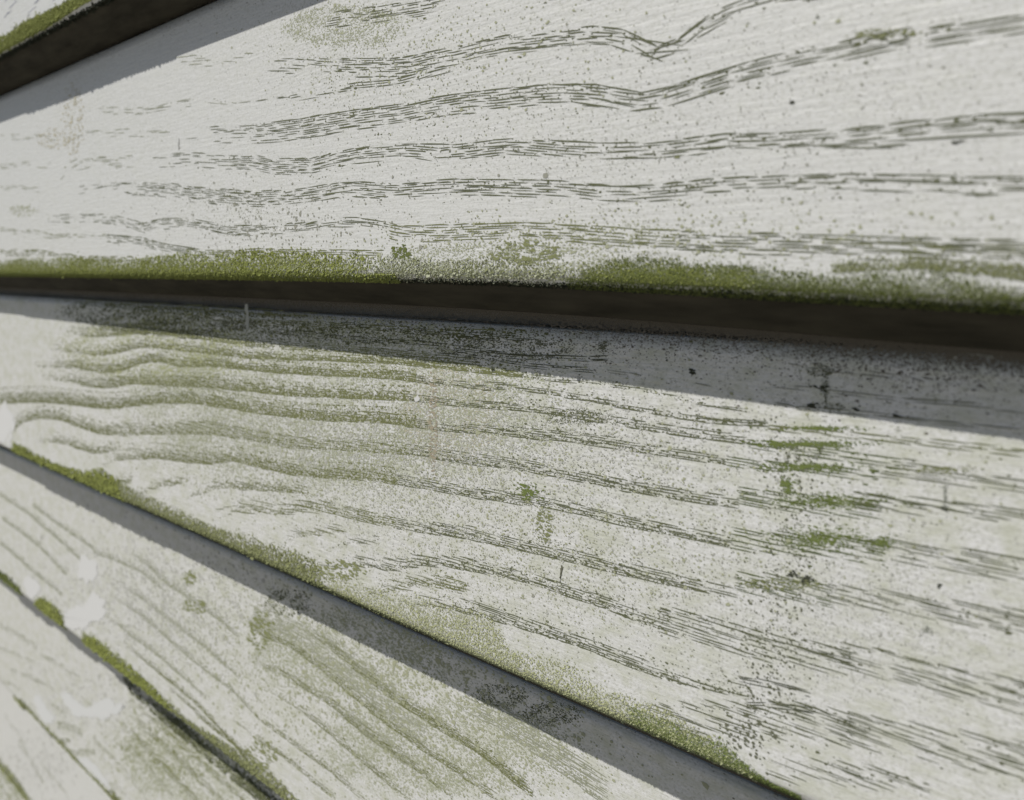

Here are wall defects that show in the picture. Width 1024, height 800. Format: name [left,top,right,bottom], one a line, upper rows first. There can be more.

water stain [181,0,1024,275]
water stain [1,304,1024,800]